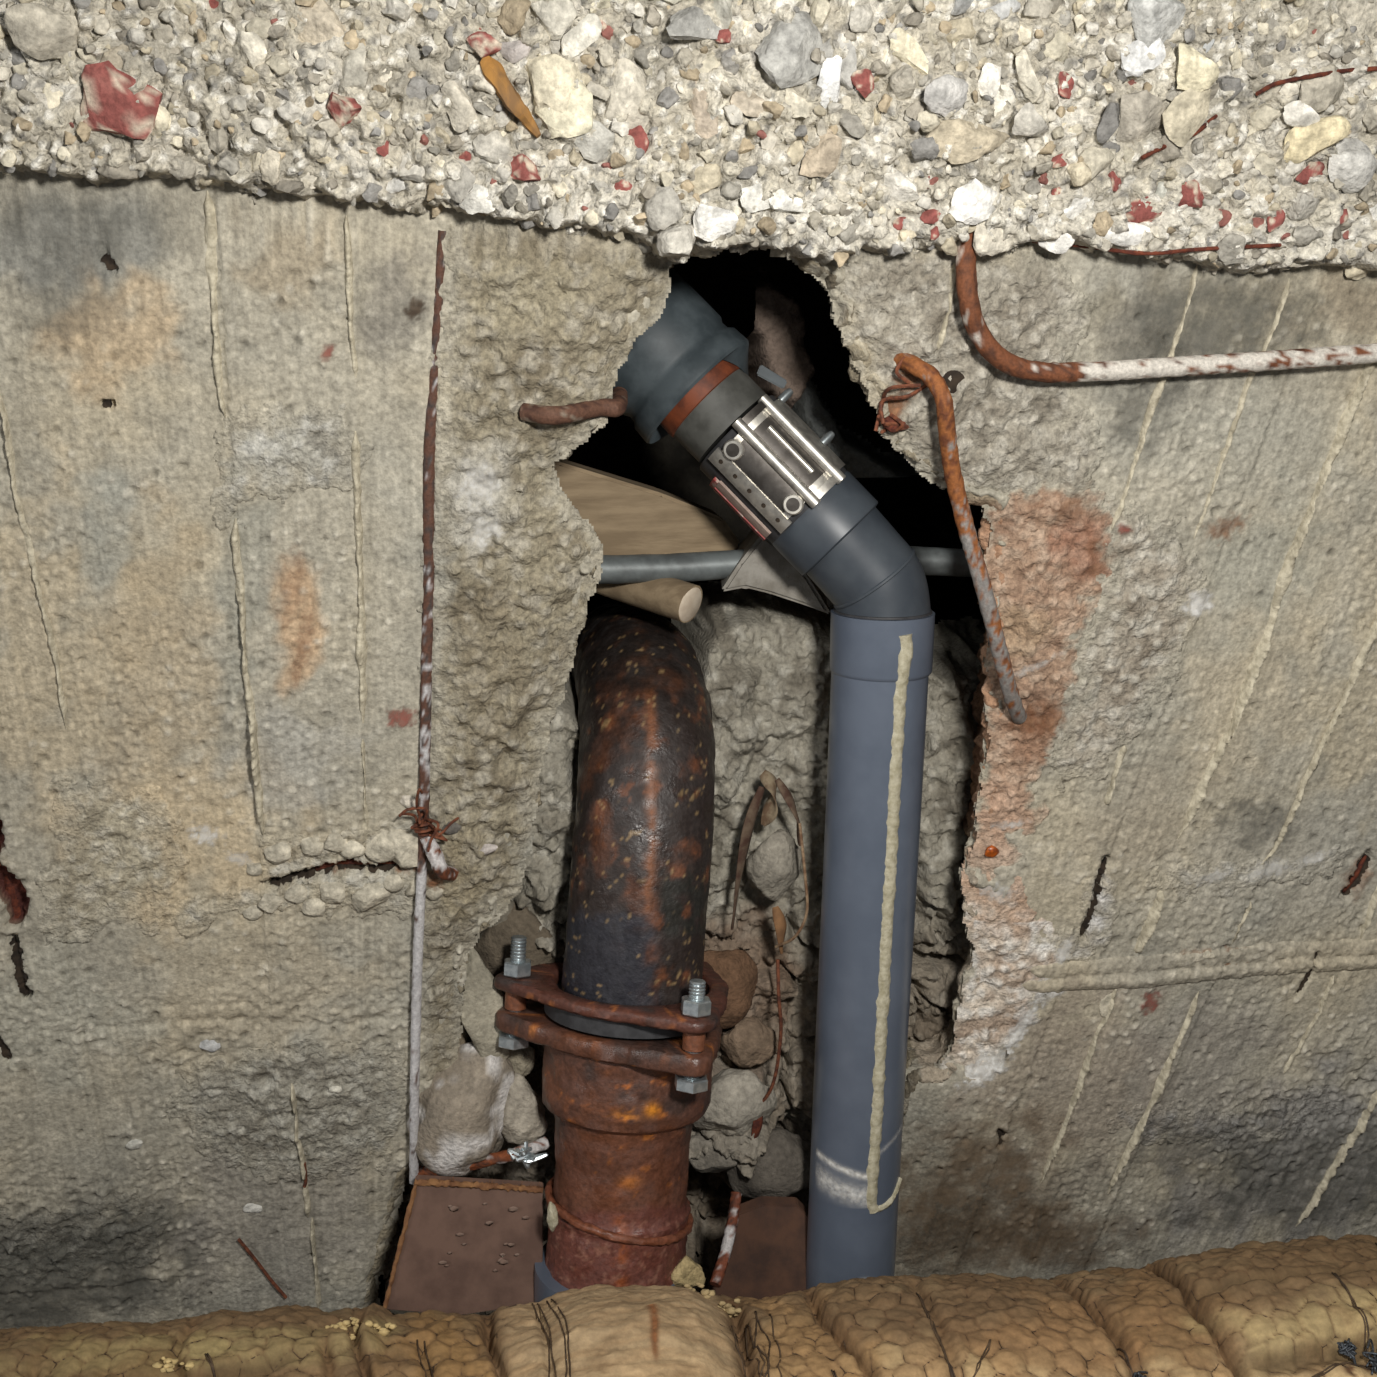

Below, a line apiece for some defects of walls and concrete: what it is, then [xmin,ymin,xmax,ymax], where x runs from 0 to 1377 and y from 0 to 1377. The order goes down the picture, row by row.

corrosion [888,372,919,417]
spalling [0,0,1377,1081]
corrosion [0,820,30,934]
crack [242,829,443,920]
crack [1080,856,1107,935]
crack [9,935,32,996]
crack [1297,952,1318,992]
spalling [160,1033,410,1185]